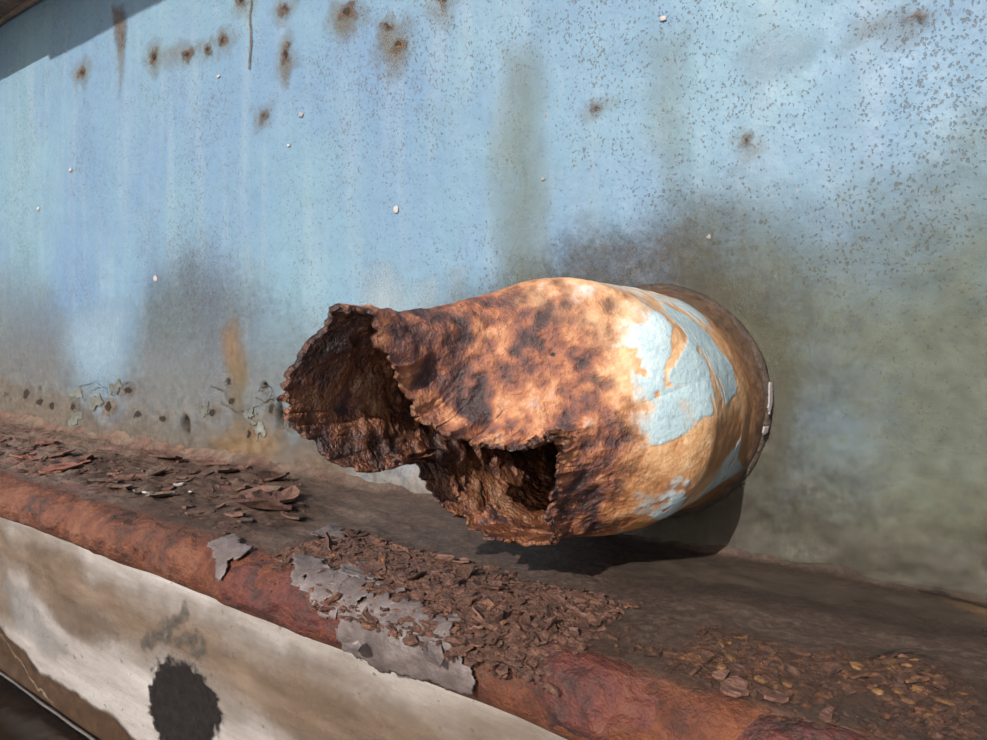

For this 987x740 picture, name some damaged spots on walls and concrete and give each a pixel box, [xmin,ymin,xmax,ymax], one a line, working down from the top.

rust [338,0,355,19]
rust [181,36,227,60]
rust [235,0,252,69]
rust [392,38,407,52]
water stain [375,287,395,309]
water stain [0,324,83,427]
peeling [68,378,129,426]
water stain [116,325,286,460]
peeling [229,485,304,511]
peeling [207,533,253,582]
water stain [0,524,517,740]
peeling [290,553,476,696]